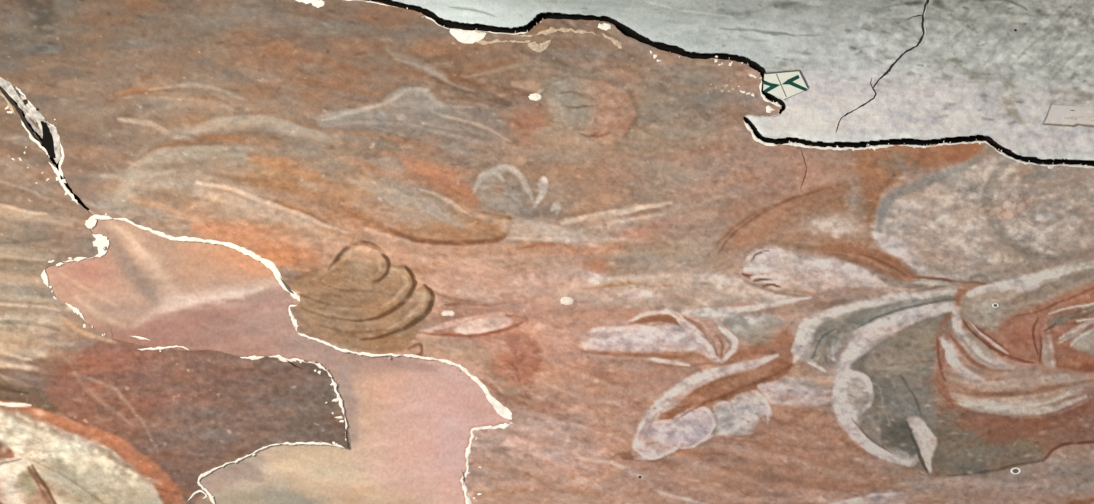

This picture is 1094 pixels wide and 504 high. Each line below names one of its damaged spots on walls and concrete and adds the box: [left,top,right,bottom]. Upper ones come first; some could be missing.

crack [0,77,89,209]
peeling [476,27,622,52]
crack [347,0,1094,189]